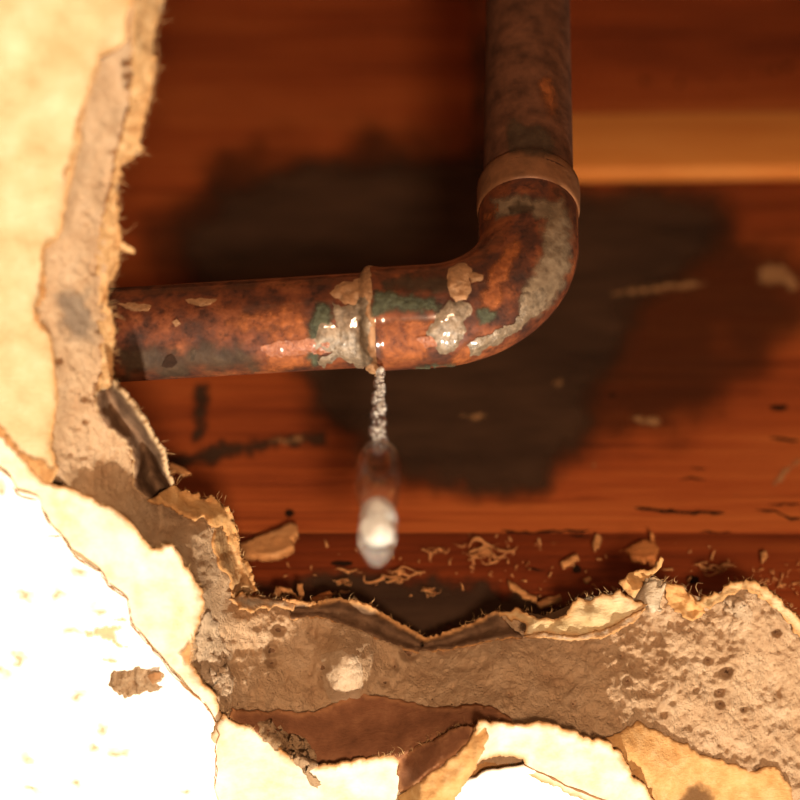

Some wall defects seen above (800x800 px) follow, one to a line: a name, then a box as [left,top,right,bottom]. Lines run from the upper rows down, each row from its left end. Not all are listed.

damp [151,131,484,283]
damp [261,338,330,358]
damp [303,187,800,496]
damp [193,385,209,441]
damp [167,433,325,467]
peeling [618,556,667,613]
peeling [87,619,126,647]
spalling [103,659,165,699]
peeling [229,694,512,765]
peeling [469,762,519,778]
peeling [605,720,793,800]